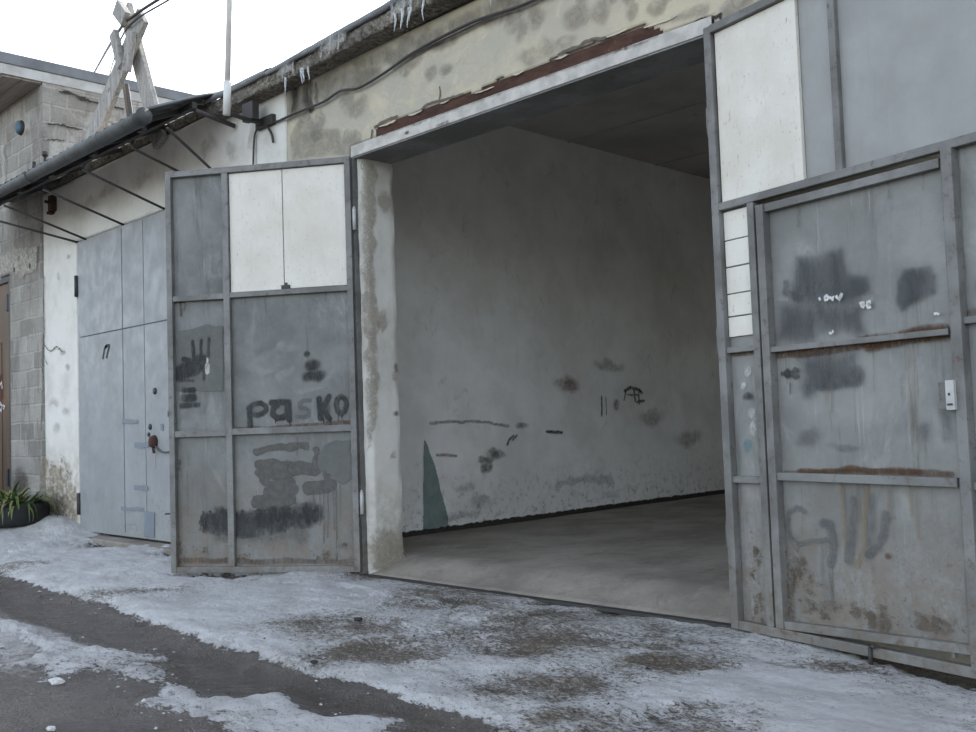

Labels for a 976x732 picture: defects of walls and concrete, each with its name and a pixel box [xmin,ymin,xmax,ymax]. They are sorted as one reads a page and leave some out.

damp [38,439,76,520]
rust [796,465,953,476]